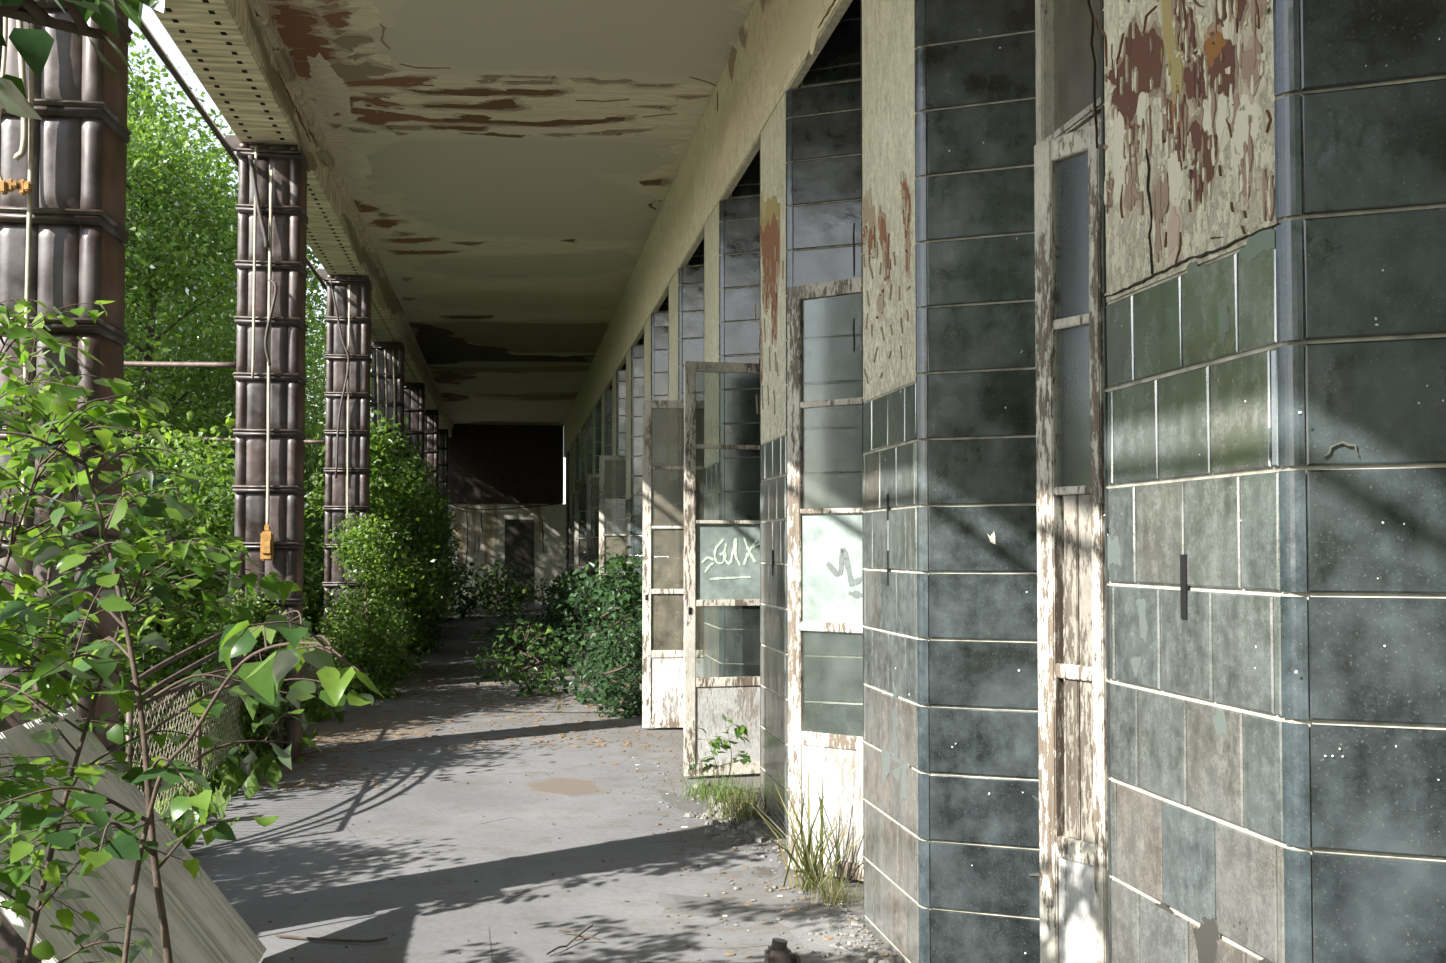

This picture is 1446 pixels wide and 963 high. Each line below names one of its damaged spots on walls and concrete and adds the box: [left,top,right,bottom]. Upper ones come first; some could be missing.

peeling [265,0,464,136]
rust [760,185,781,248]
peeling [1102,0,1276,273]
crack [1103,110,1280,298]